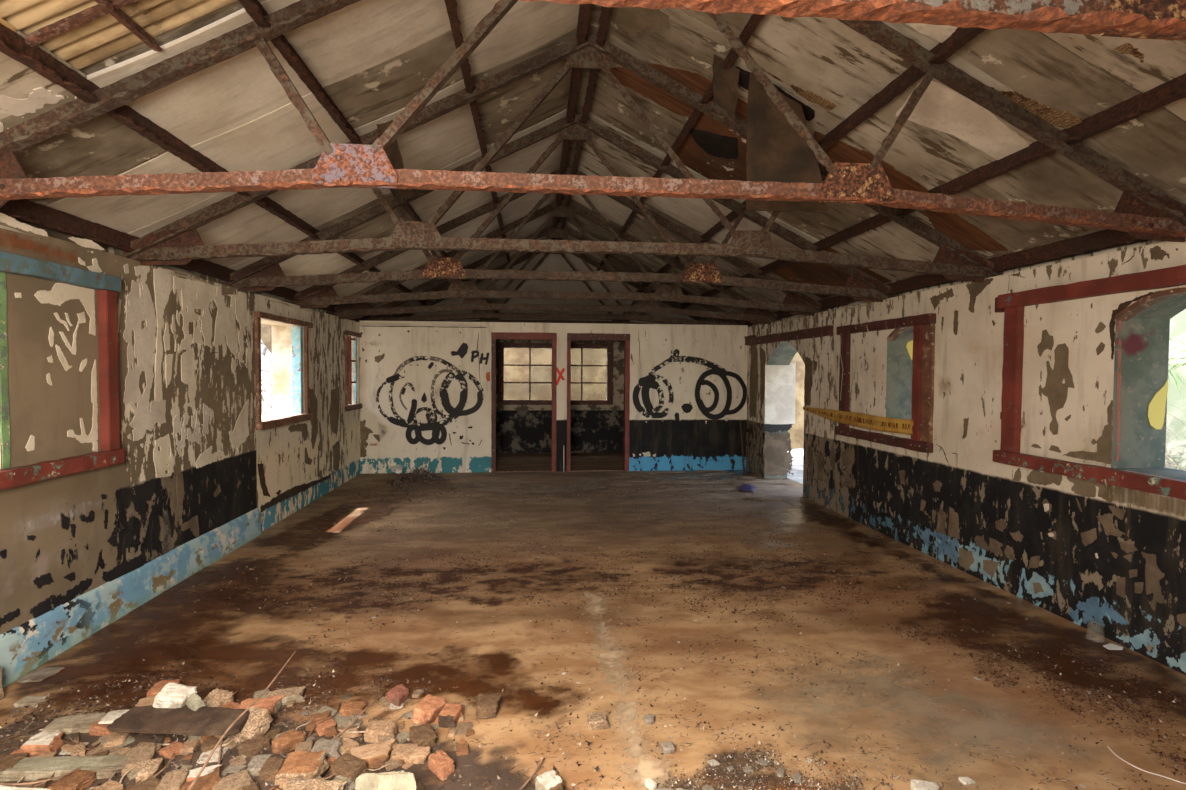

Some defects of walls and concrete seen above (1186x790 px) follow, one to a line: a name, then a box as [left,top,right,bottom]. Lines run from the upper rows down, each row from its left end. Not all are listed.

peeling [925,210,1008,251]
peeling [1149,246,1178,261]
peeling [930,278,993,335]
peeling [257,387,340,512]
peeling [913,480,1023,584]
peeling [1013,468,1186,673]